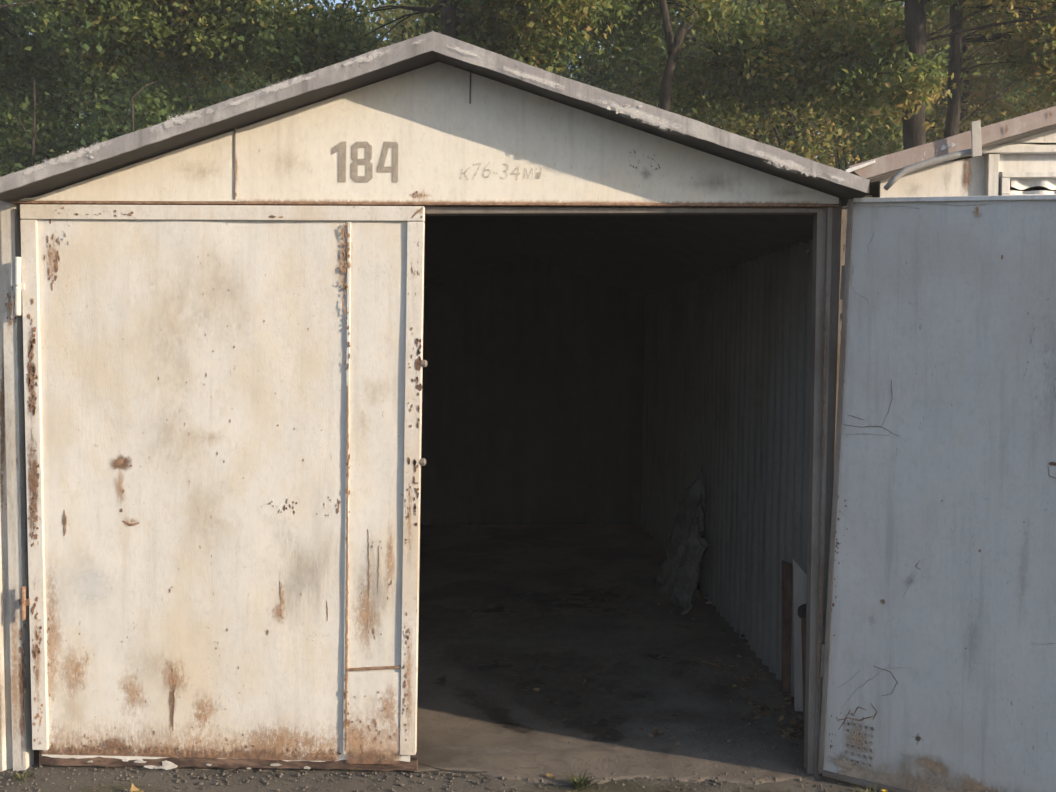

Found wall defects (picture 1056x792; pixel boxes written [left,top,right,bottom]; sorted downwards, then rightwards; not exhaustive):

corrosion [338,223,351,370]
crack [844,380,898,436]
corrosion [19,386,411,764]
crack [829,666,909,749]
corrosion [833,756,988,792]